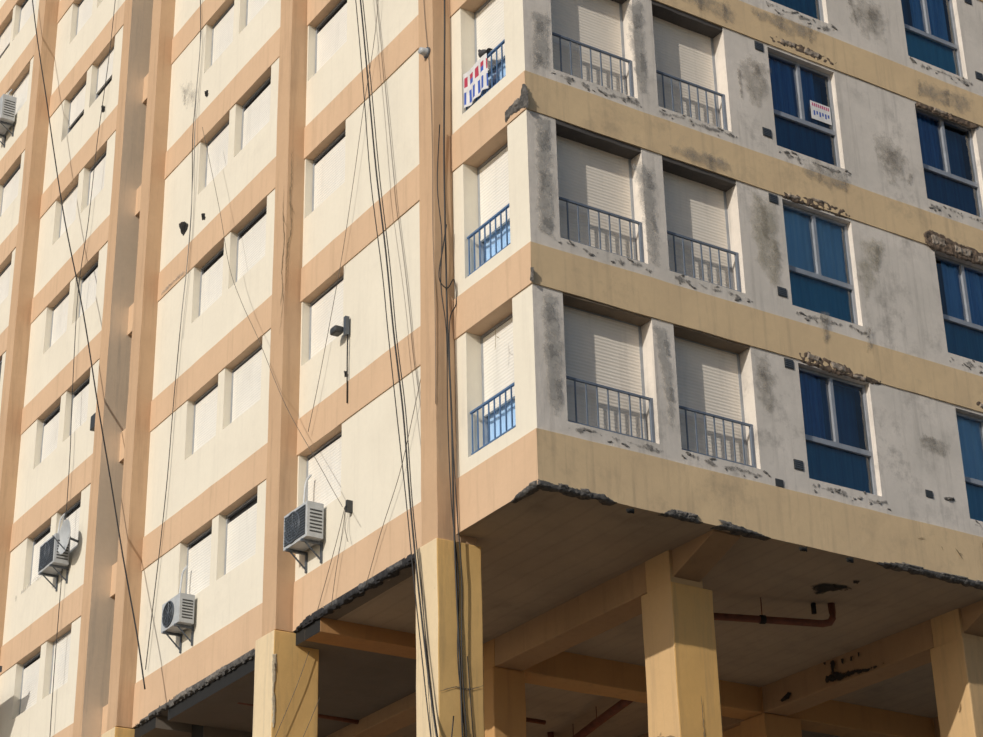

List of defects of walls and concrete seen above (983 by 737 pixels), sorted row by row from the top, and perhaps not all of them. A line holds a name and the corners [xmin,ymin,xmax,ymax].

spalling [505,84,529,122]
peeling [536,117,595,256]
spalling [782,192,850,219]
spalling [923,230,983,265]
spalling [799,352,881,385]
spalling [511,479,634,514]
spalling [658,509,771,541]
spalling [877,562,983,590]